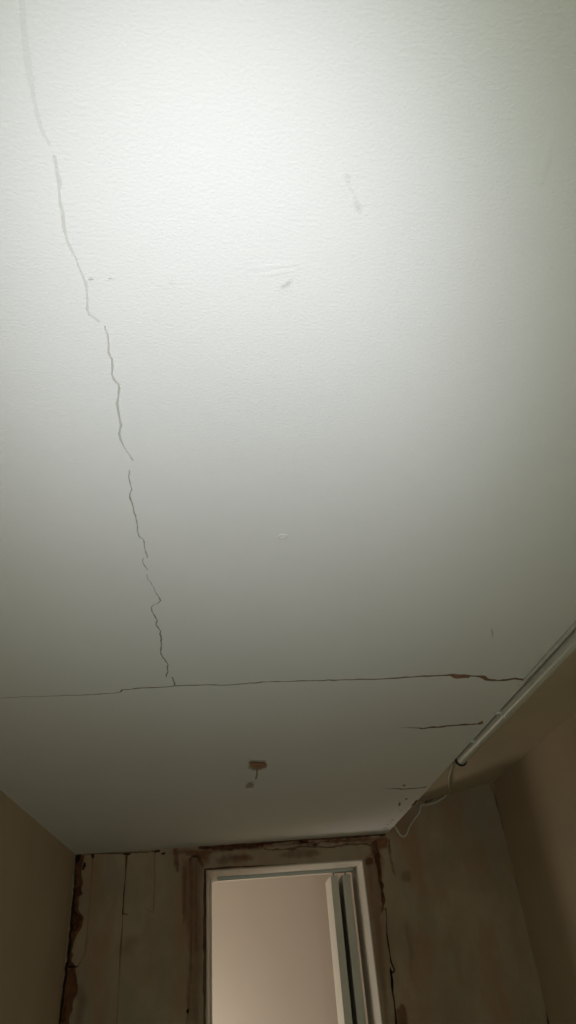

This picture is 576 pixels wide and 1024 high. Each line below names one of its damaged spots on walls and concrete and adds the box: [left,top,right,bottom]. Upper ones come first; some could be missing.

crack [108,353,134,461]
crack [61,598,523,696]
peeling [249,761,266,779]
crack [418,721,483,729]
spalling [60,854,86,1024]